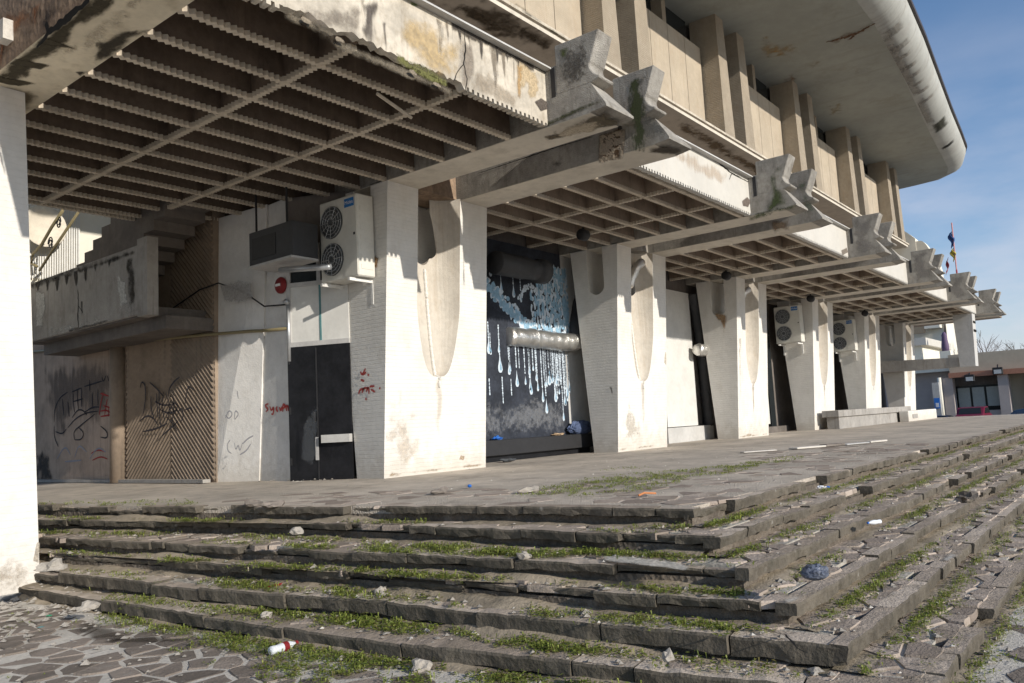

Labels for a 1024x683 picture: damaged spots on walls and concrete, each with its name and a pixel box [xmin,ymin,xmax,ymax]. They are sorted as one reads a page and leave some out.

damp [0,0,113,106]
damp [96,31,140,60]
damp [325,4,386,40]
crack [453,23,468,93]
damp [405,4,563,84]
damp [563,46,586,83]